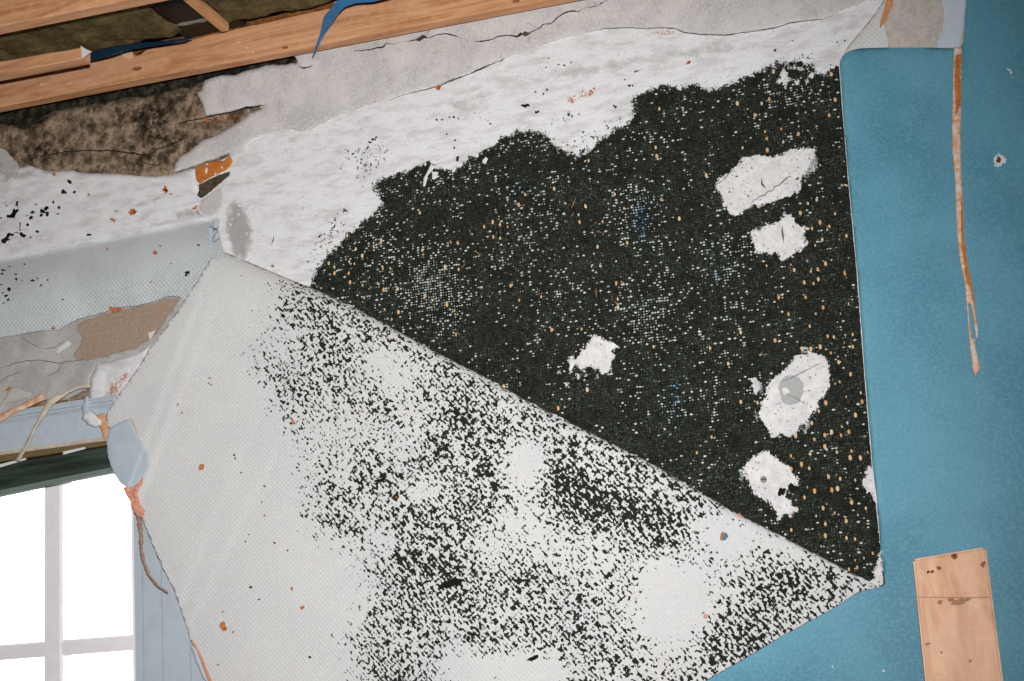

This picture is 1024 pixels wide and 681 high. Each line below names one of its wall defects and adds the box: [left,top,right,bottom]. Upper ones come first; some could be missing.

crack [353,0,834,99]
peeling [81,330,156,428]
peeling [557,334,618,388]
peeling [750,347,833,438]
peeling [739,450,799,521]
peeling [862,466,877,503]